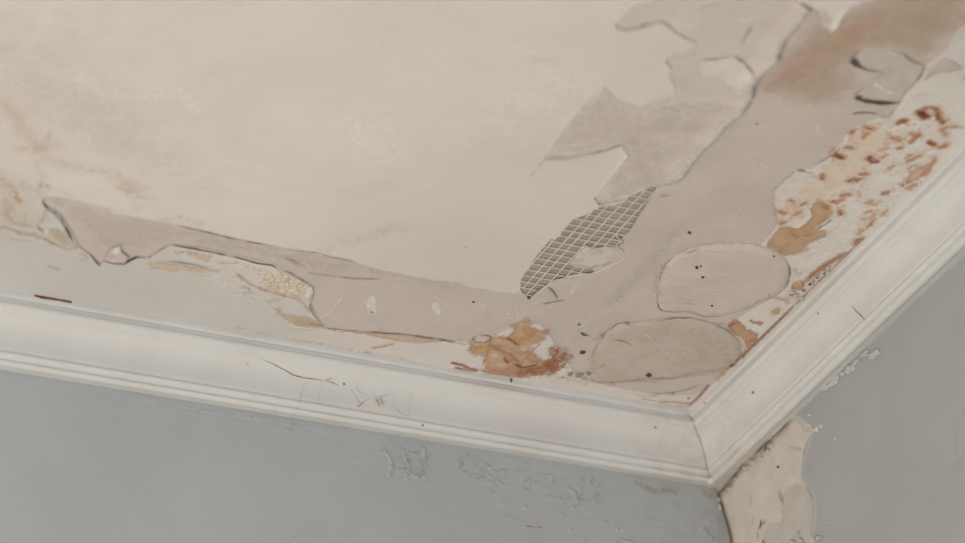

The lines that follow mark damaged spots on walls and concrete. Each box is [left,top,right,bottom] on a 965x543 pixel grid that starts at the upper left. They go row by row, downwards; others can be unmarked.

peeling [37,0,965,402]
flaking render [719,416,822,543]